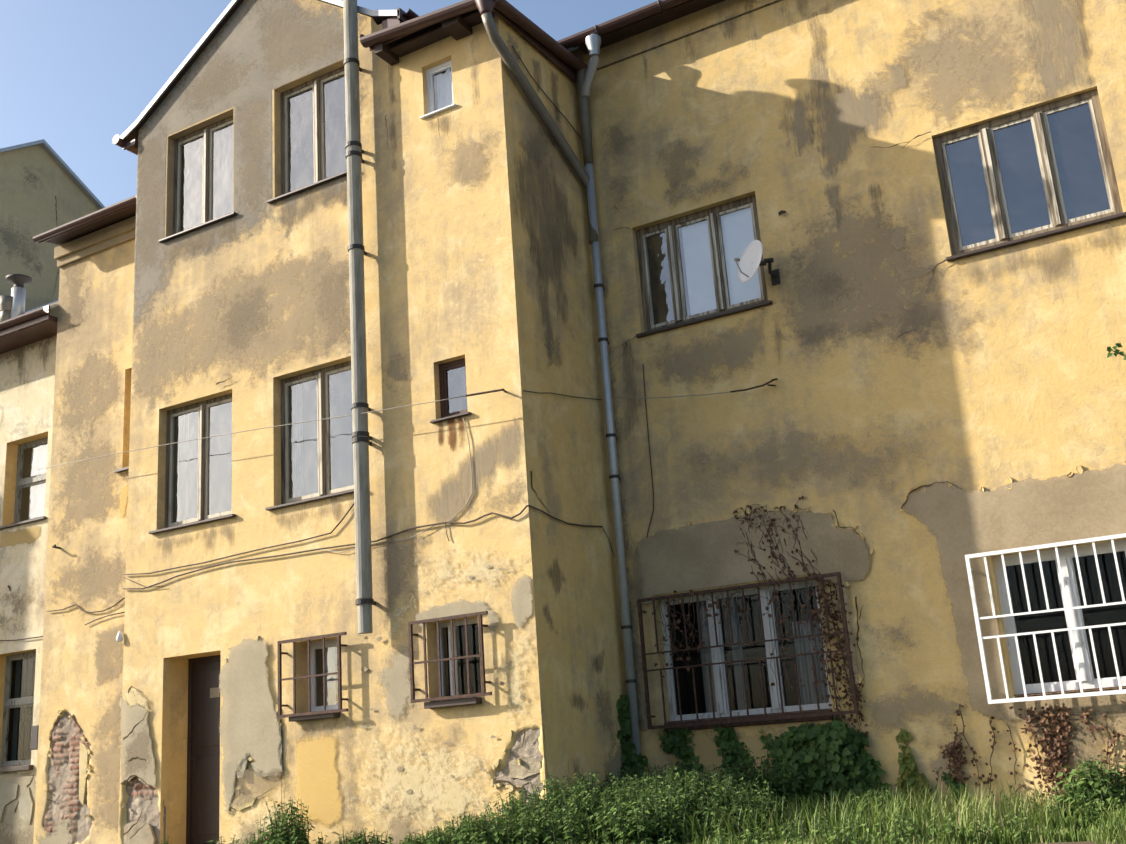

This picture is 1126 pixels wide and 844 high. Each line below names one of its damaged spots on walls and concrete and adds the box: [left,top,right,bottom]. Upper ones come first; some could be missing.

damp [133,0,351,403]
damp [519,129,577,363]
damp [776,0,1091,361]
rust [438,417,464,449]
peeling [376,548,519,642]
spalling [0,710,93,844]
flaking render [120,686,166,844]
flaking render [217,635,284,844]
peeling [345,634,548,844]